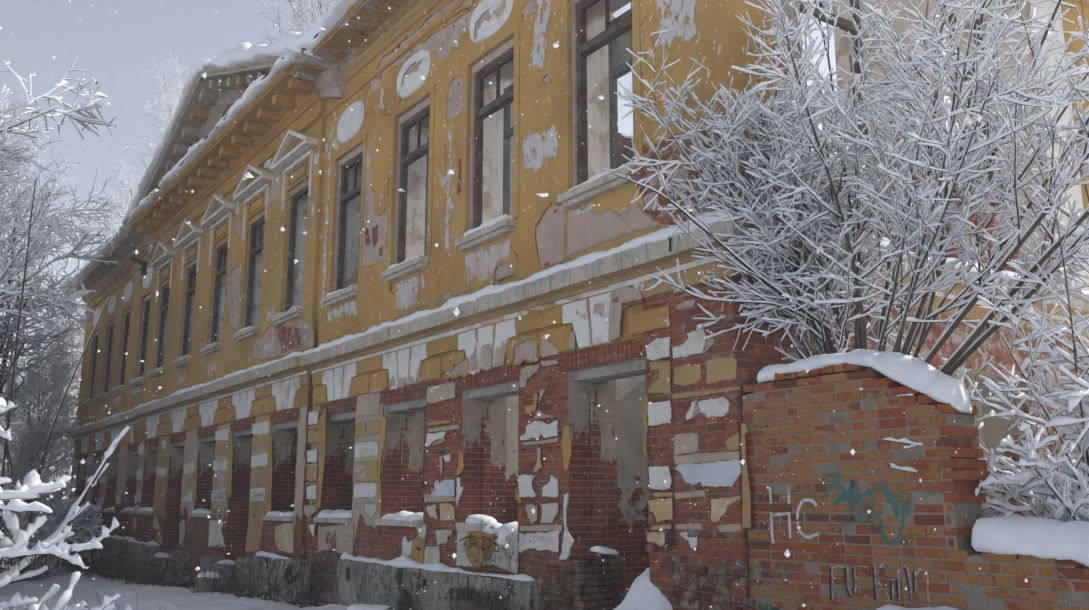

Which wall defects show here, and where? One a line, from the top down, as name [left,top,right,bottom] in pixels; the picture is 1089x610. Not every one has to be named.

spalling [358,133,389,269]
spalling [364,0,509,116]
spalling [439,74,463,260]
spalling [492,260,516,285]
peeling [521,0,559,91]
peeling [522,113,558,173]
spalling [531,200,567,271]
flaking render [634,0,742,227]
peeling [245,408,354,604]
peeling [354,331,575,575]
peeling [527,281,751,549]